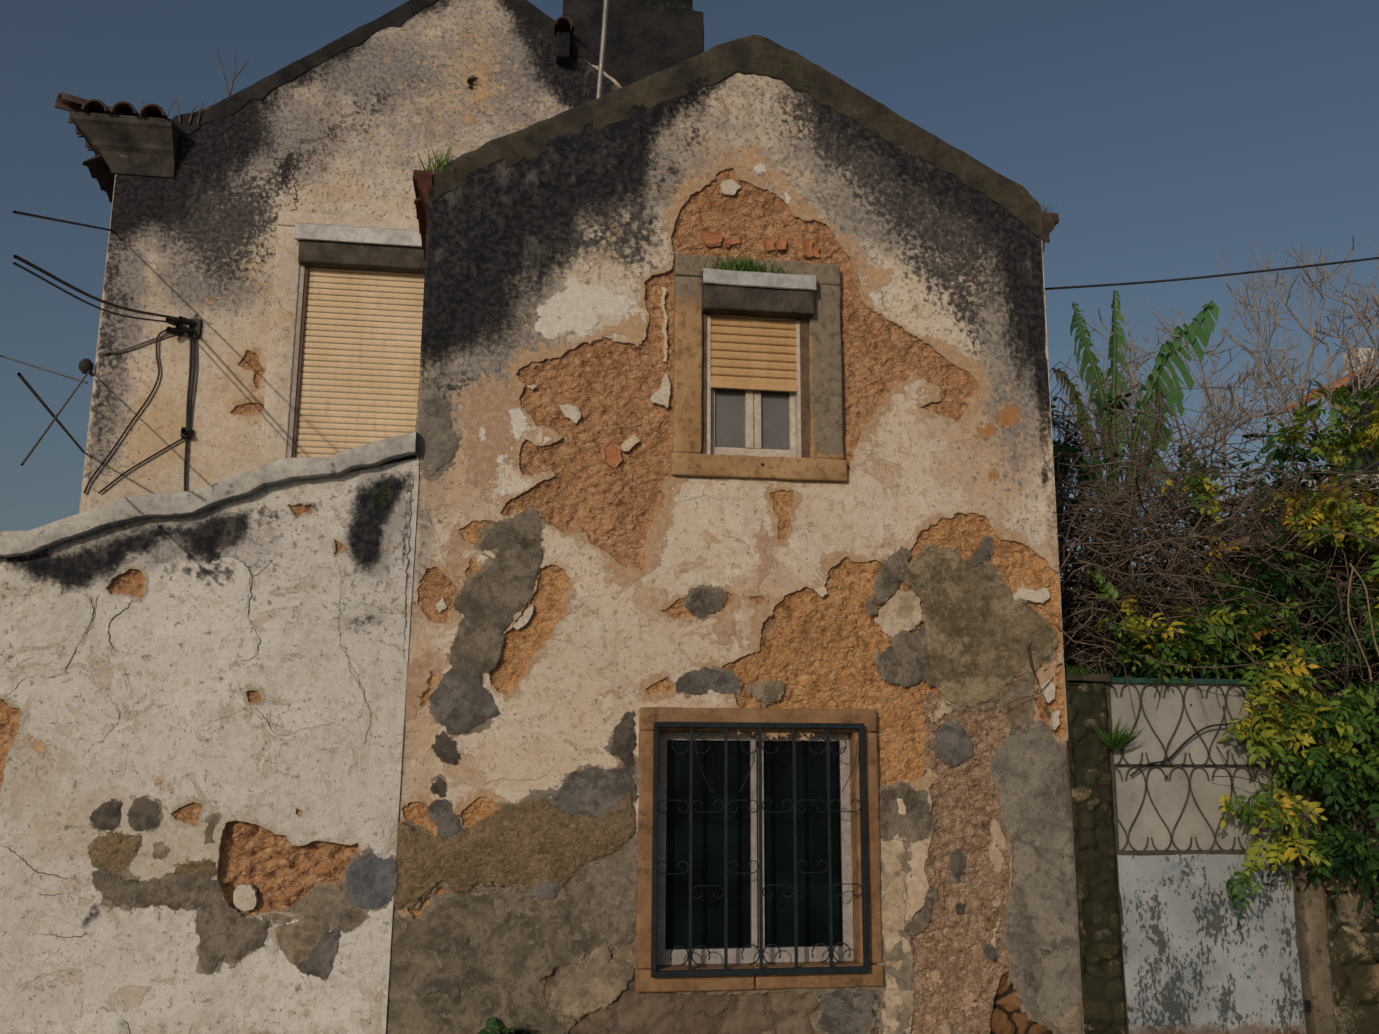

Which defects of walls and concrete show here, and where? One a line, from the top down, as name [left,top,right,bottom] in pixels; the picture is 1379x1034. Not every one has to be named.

water stain [84,43,393,478]
water stain [419,74,725,398]
water stain [775,91,1051,443]
flaking render [229,347,265,419]
crack [4,589,132,698]
water stain [7,508,278,596]
crack [202,553,376,760]
water stain [348,474,413,569]
flaking render [415,147,1068,1034]
flaking render [0,695,50,792]
crack [0,845,80,896]
flaking render [213,818,360,920]